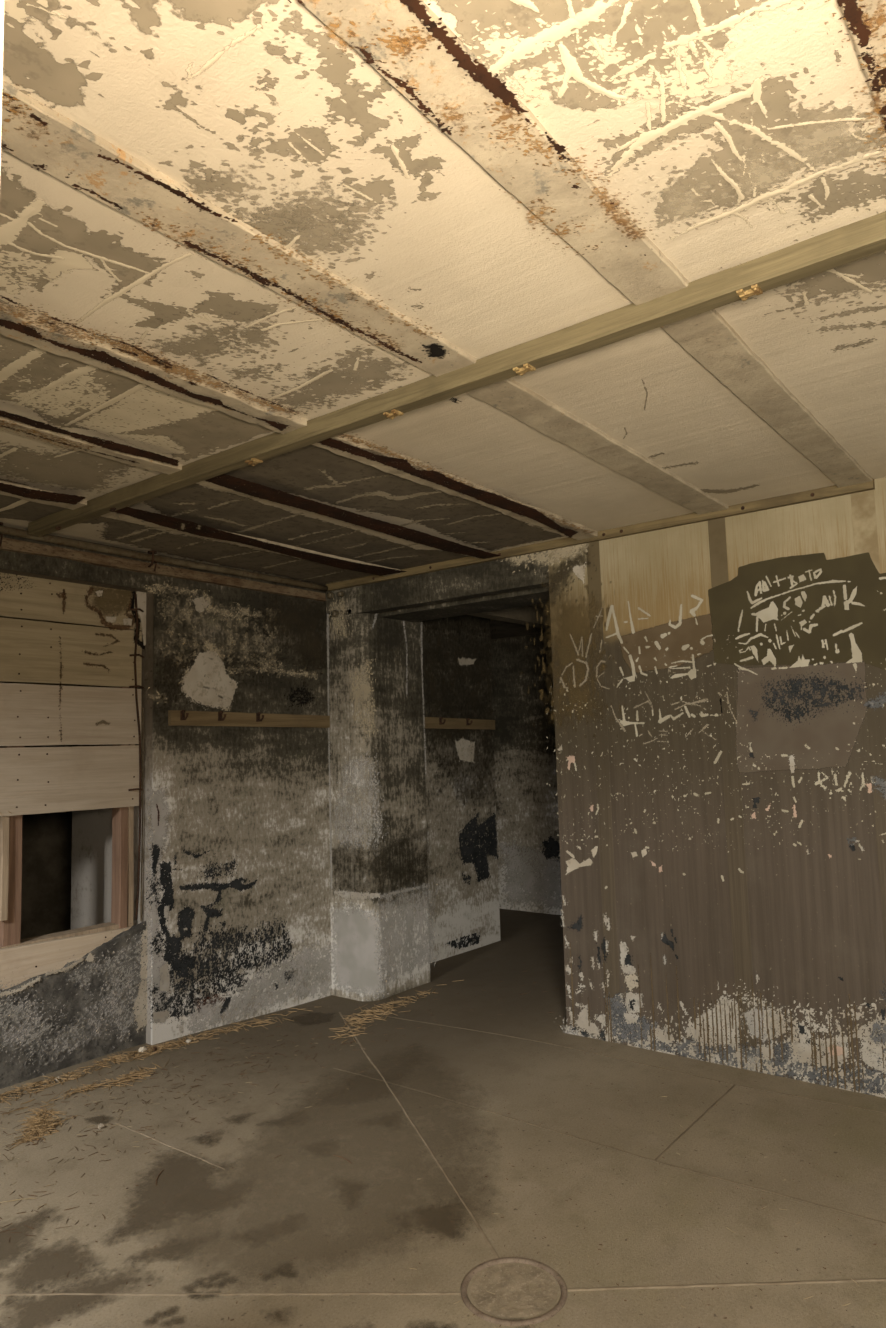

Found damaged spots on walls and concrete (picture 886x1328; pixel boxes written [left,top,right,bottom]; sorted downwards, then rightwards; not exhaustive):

peeling [3,0,131,108]
peeling [120,0,446,283]
corrosion [326,0,655,256]
peeling [468,4,748,115]
corrosion [825,0,886,174]
peeling [0,161,416,414]
leakage [79,445,564,995]
leakage [0,923,145,1081]
leakage [177,933,332,1036]
peeling [458,809,886,1098]
leakage [0,1210,201,1328]
leakage [110,1156,251,1242]